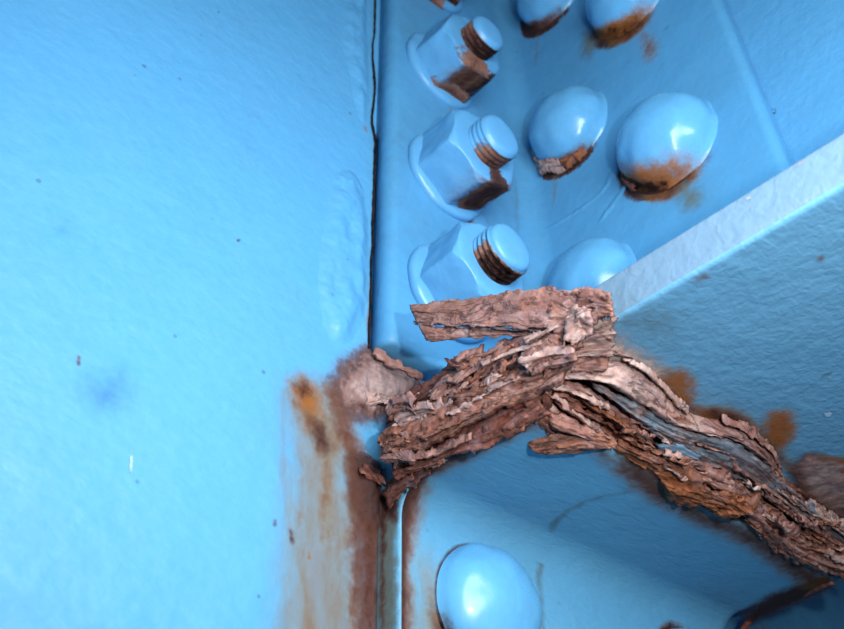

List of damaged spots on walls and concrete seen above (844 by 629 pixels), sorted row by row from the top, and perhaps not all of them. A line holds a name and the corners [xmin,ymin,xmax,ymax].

corrosion [429,0,461,10]
corrosion [520,6,569,38]
corrosion [585,9,649,51]
crack [365,0,377,348]
corrosion [542,144,593,181]
corrosion [617,159,698,205]
corrosion [293,240,844,629]